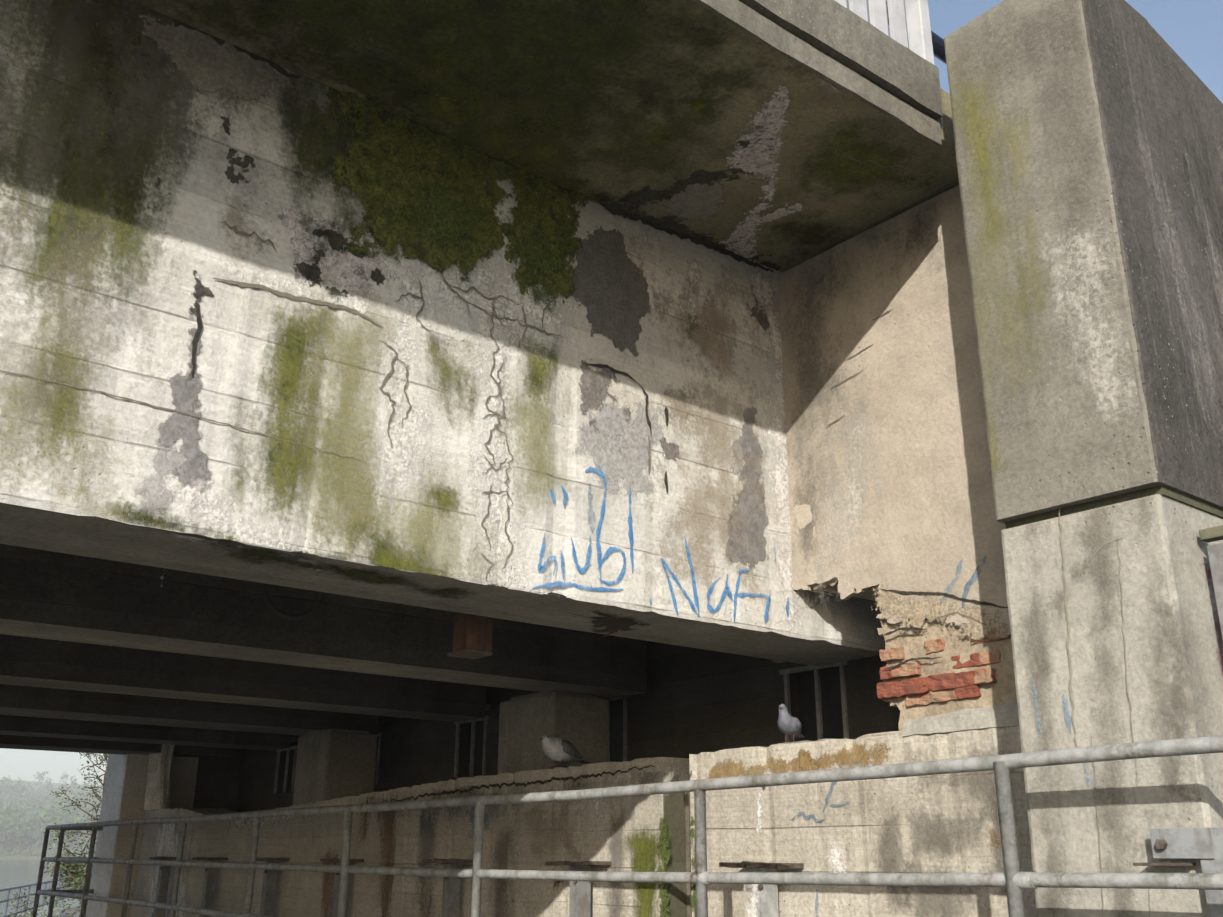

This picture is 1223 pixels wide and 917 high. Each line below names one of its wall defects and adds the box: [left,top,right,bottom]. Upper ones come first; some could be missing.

crack [190,262,569,378]
peeling [570,227,651,357]
damp [1057,233,1135,409]
crack [0,370,368,463]
peeling [575,360,680,495]
flaking render [874,584,1011,707]
corrosion [360,801,395,917]